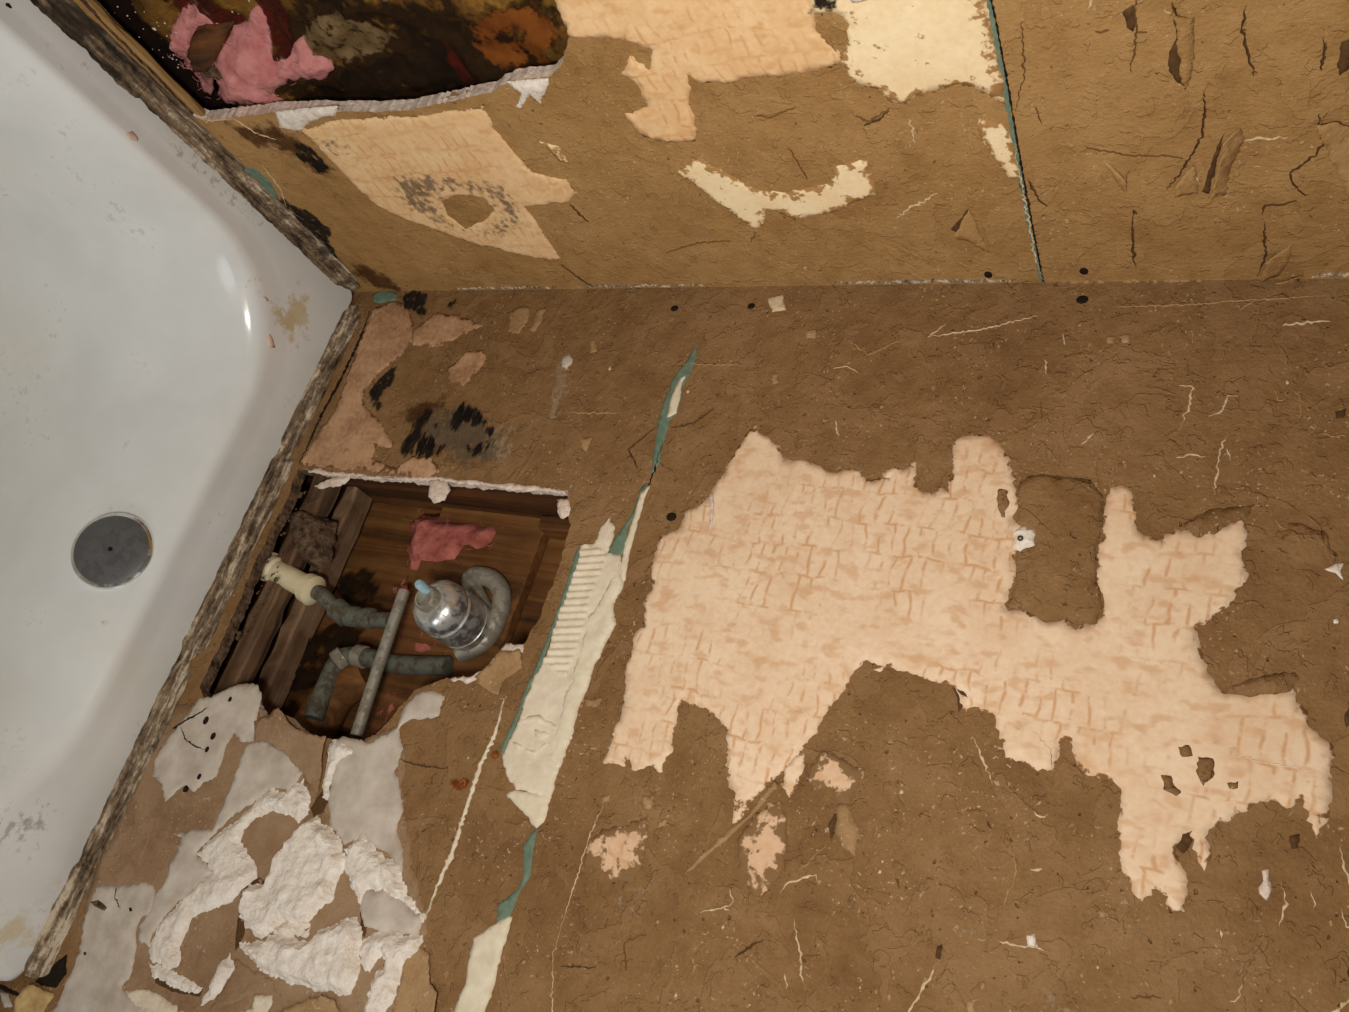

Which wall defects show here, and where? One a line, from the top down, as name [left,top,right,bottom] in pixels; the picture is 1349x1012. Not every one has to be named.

damp [163,0,246,31]
damp [255,0,560,102]
peeling [555,0,1005,143]
crack [1240,6,1255,76]
peeling [275,105,577,261]
crack [1130,209,1138,266]
crack [1086,92,1207,188]
crack [1257,114,1325,276]
damp [369,367,396,411]
damp [400,402,504,464]
peeling [603,425,1336,912]
spalling [148,698,504,1012]